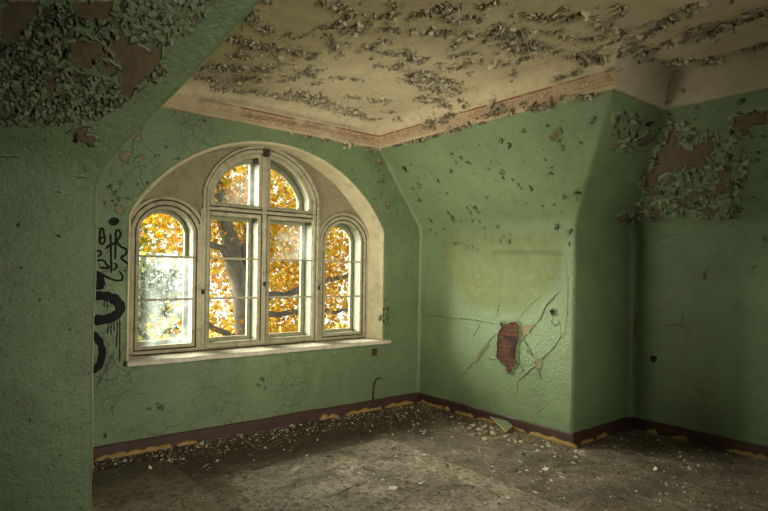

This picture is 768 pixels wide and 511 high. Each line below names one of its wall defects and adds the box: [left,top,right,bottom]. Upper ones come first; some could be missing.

peeling [0,0,213,147]
peeling [192,0,768,247]
flaking render [426,290,563,399]